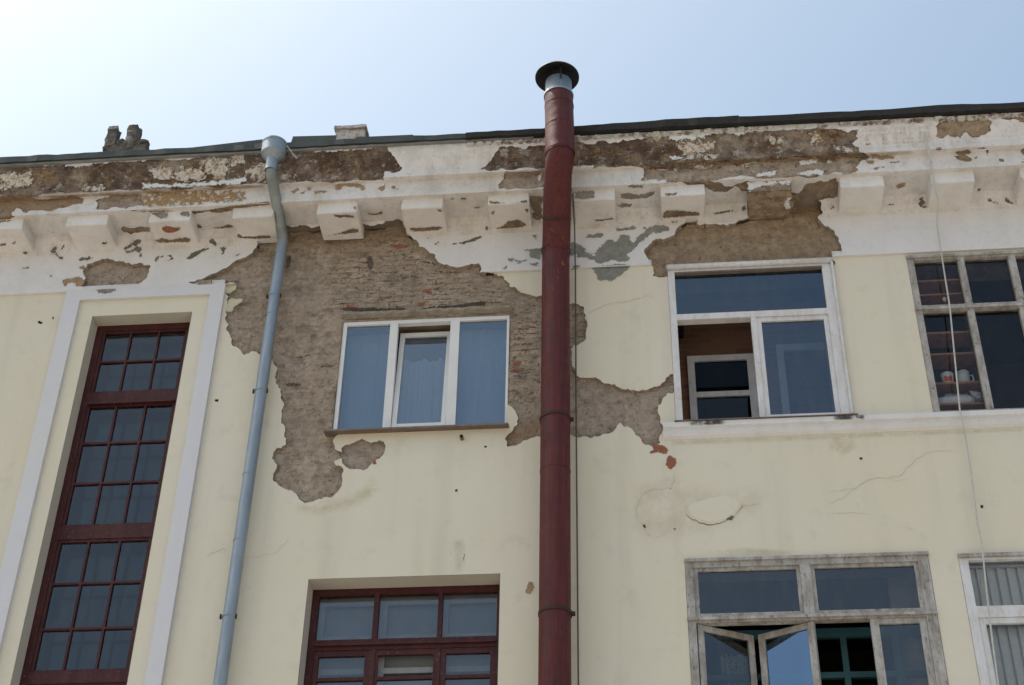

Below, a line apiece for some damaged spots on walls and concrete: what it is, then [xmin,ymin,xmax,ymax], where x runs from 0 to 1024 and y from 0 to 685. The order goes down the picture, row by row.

flaking render [570,124,899,282]
flaking render [935,117,991,162]
flaking render [0,140,546,503]
flaking render [570,306,677,469]